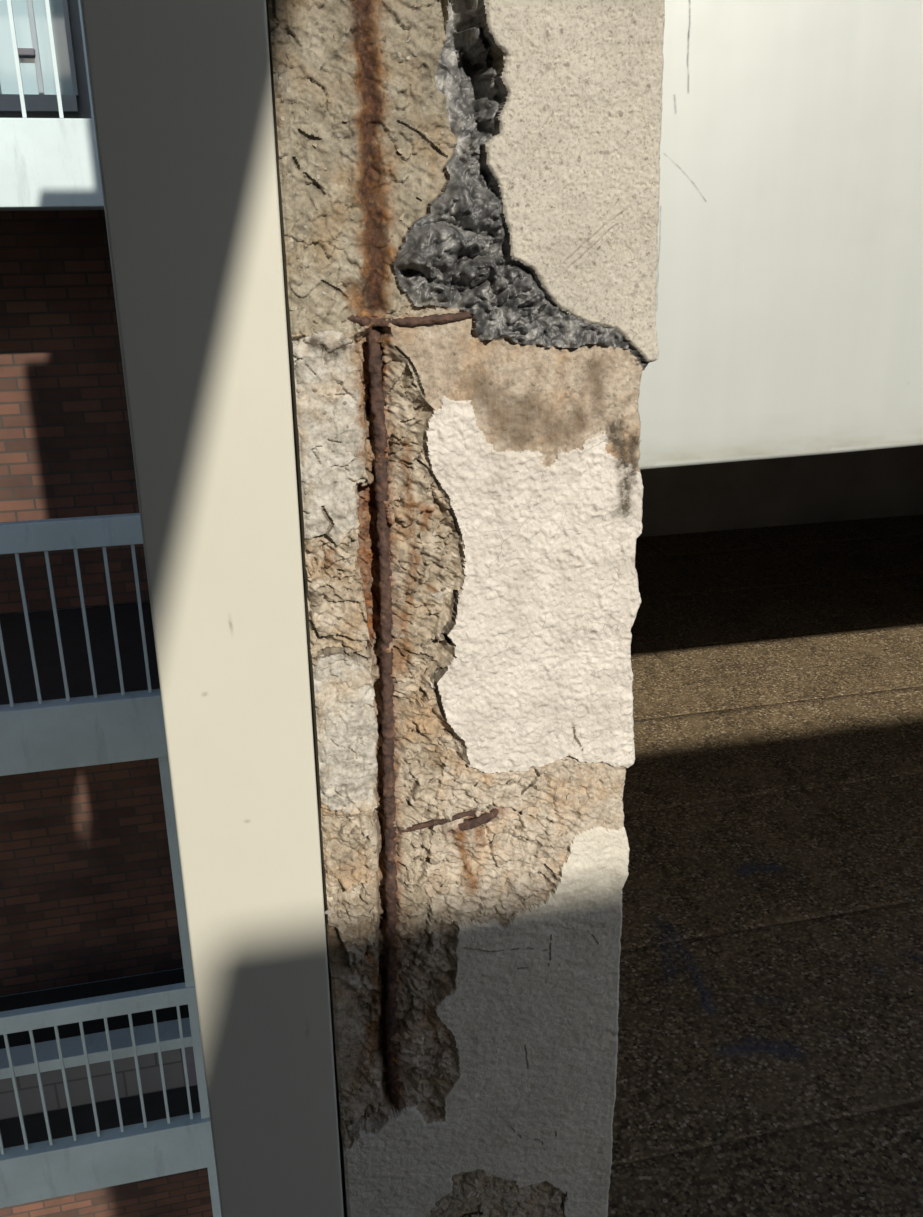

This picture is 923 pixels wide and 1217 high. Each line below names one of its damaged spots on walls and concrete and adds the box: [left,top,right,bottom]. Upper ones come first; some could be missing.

crack [269,0,277,19]
crack [292,129,326,196]
corrosion [349,0,395,343]
crack [396,120,448,159]
crack [321,279,349,300]
water stain [630,436,639,475]
spalling [268,0,645,1150]
corrosion [455,826,482,889]
spalling [426,1169,568,1217]